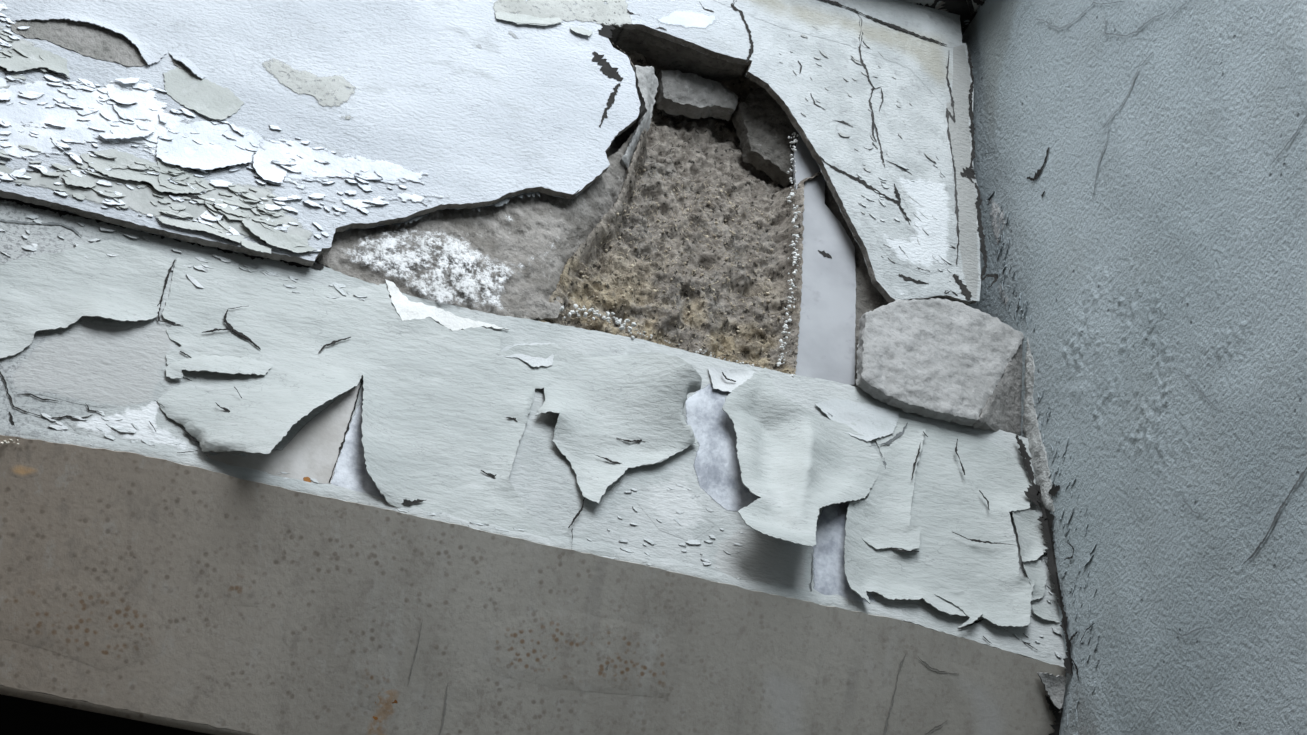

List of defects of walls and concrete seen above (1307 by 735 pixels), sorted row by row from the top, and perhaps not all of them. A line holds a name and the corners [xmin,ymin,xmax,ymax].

crack [592,9,666,128]
crack [700,0,754,62]
crack [798,0,998,300]
crack [1037,0,1188,199]
crack [1271,116,1307,165]
peeling [0,0,1099,693]
crack [1241,467,1307,566]